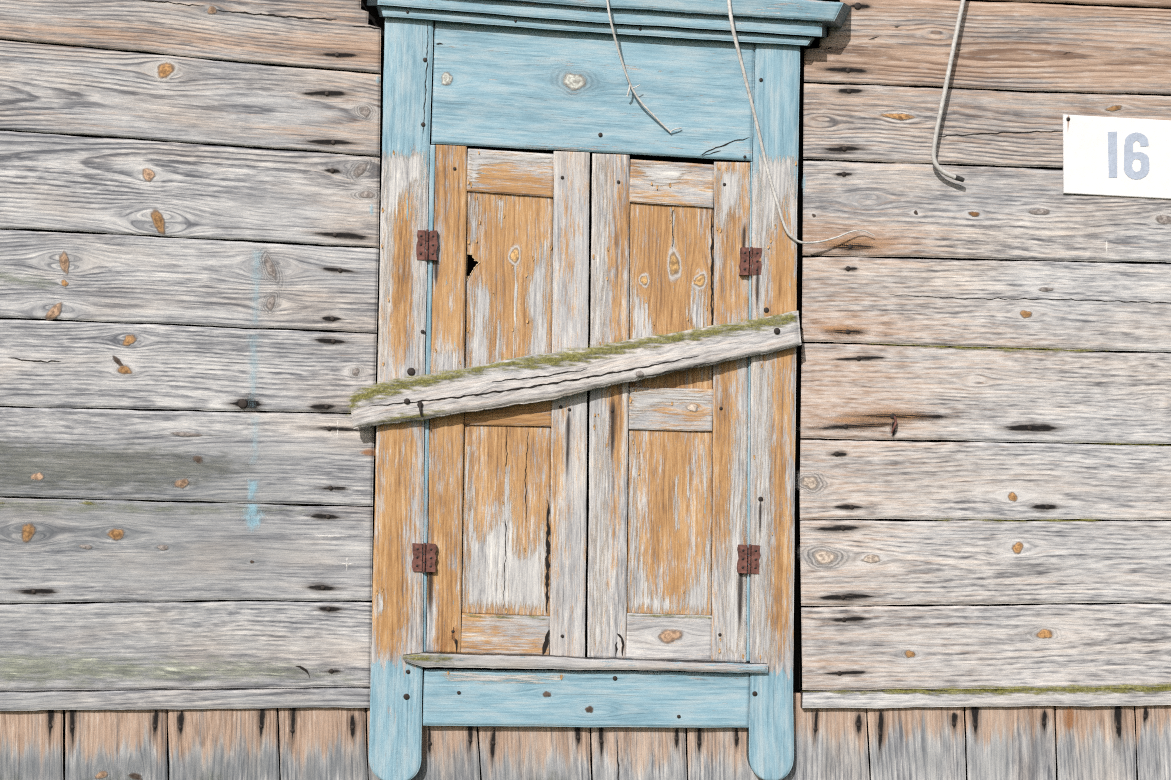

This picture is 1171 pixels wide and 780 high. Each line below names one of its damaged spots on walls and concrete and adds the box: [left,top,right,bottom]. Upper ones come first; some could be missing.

peeling [378,150,427,377]
peeling [415,151,552,374]
peeling [590,160,610,348]
peeling [628,282,655,340]
peeling [636,163,690,189]
peeling [686,280,707,330]
peeling [714,155,797,318]
peeling [373,587,383,616]
peeling [461,445,548,615]
peeling [627,363,776,659]